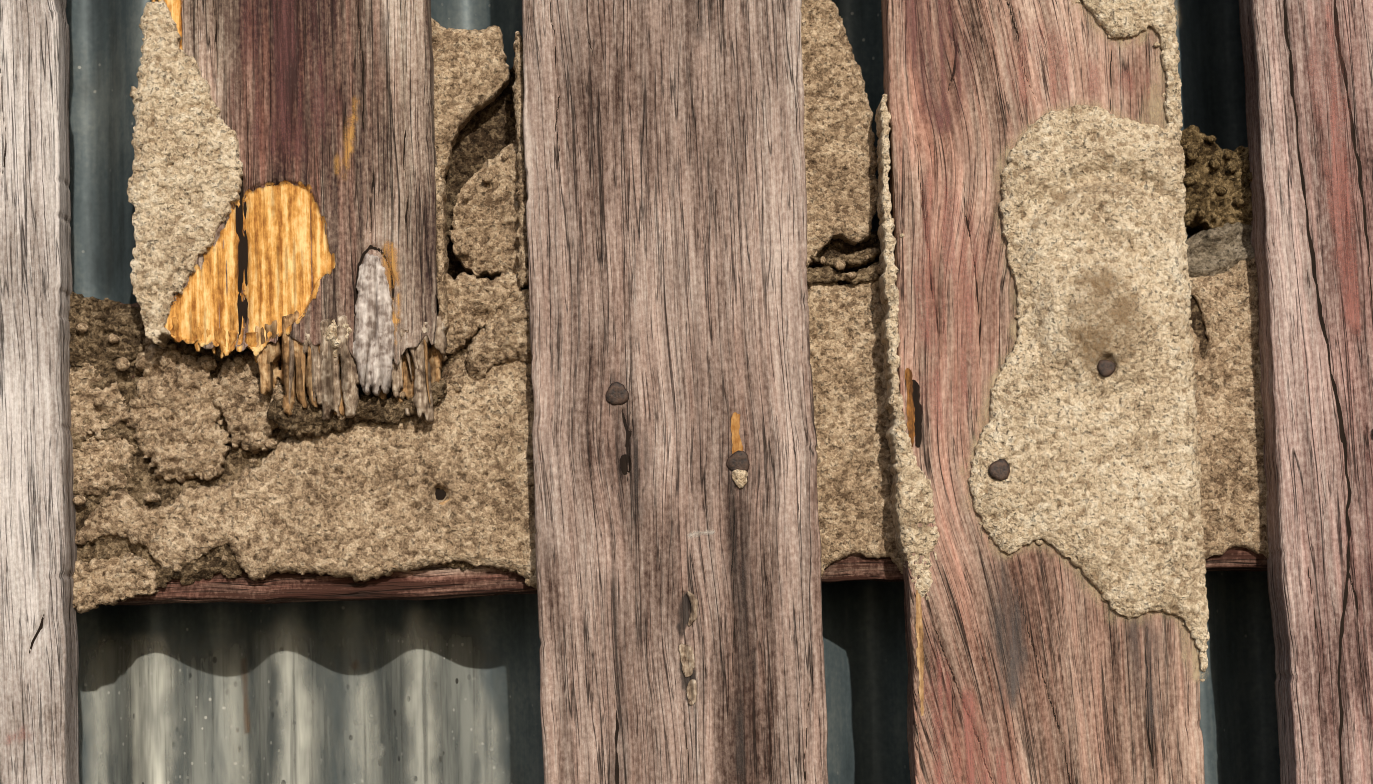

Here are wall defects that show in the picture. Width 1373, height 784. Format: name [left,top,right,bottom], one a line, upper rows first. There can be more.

crack [1334,0,1373,321]
crack [1283,0,1363,784]
crack [29,614,44,654]